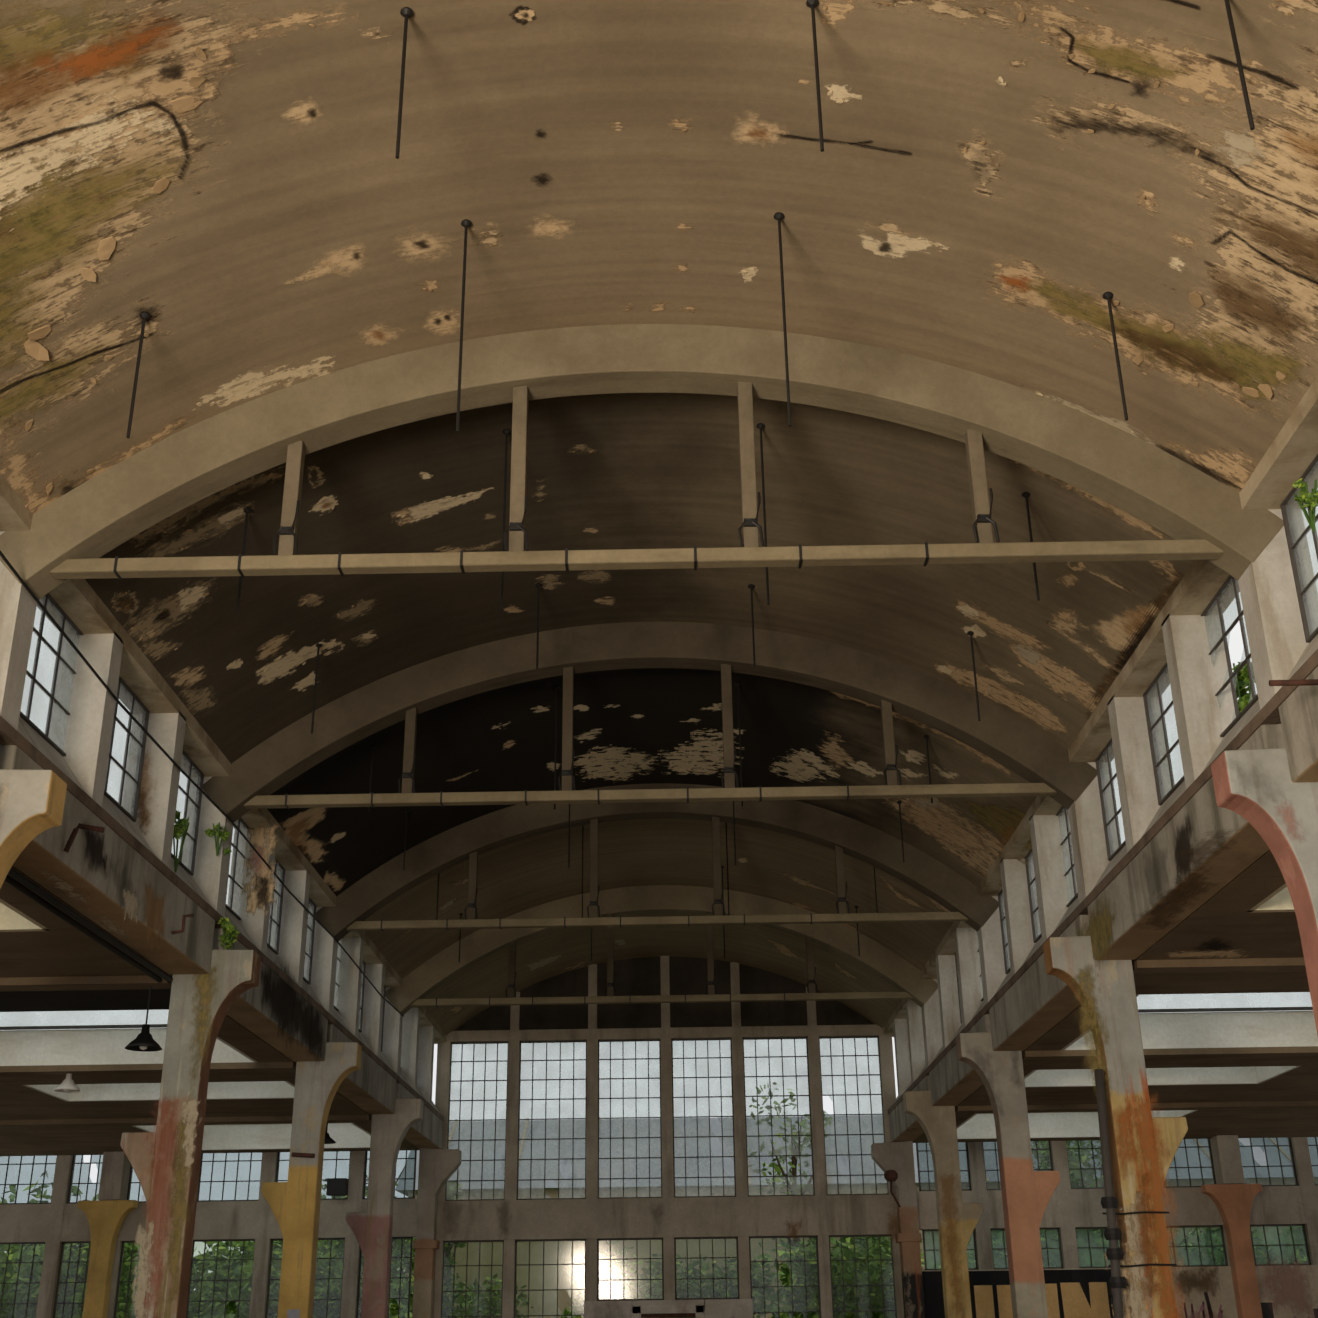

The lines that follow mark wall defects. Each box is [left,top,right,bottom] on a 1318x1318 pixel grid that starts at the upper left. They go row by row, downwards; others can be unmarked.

peeling [1262,0,1318,29]
leakage [0,0,261,380]
leakage [983,0,1318,424]
peeling [0,294,339,514]
peeling [111,577,217,663]
peeling [169,666,217,711]
peeling [226,630,379,691]
peeling [934,562,1158,736]
peeling [547,703,746,783]
peeling [770,730,883,783]
leakage [261,967,323,1058]
corrosion [1117,1101,1181,1318]